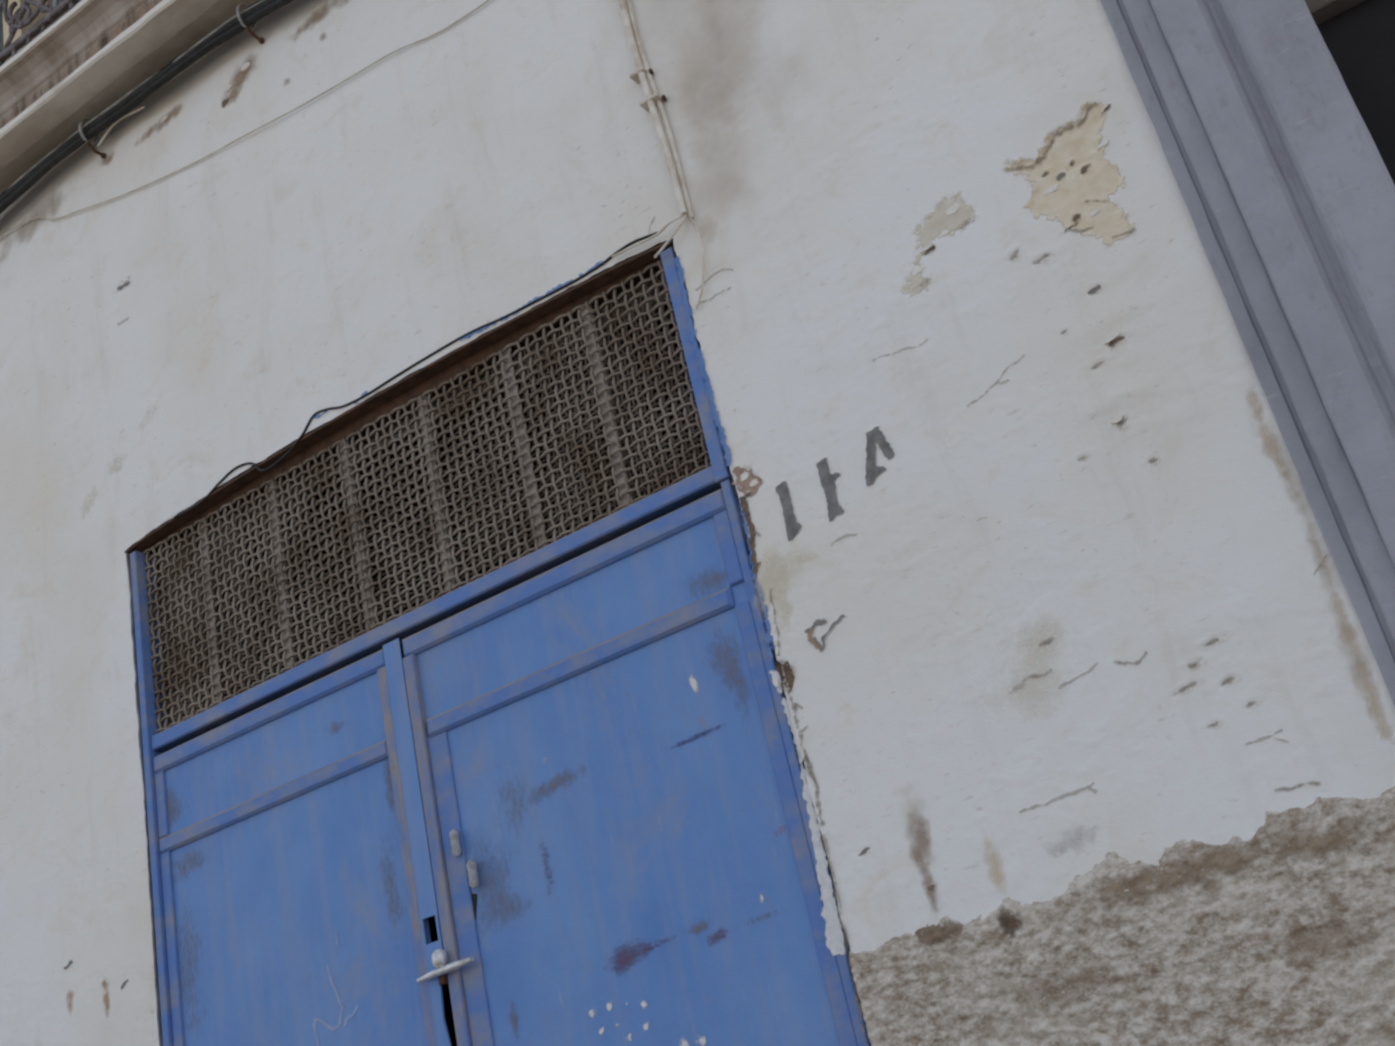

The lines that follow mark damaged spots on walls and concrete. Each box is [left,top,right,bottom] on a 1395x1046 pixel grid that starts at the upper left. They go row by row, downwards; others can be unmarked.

flaking render [1005,102,1135,245]
flaking render [901,192,975,295]
flaking render [732,466,763,498]
leakage [913,821,928,862]
leakage [925,877,935,904]
flaking render [915,920,963,946]
flaking render [997,910,1021,937]